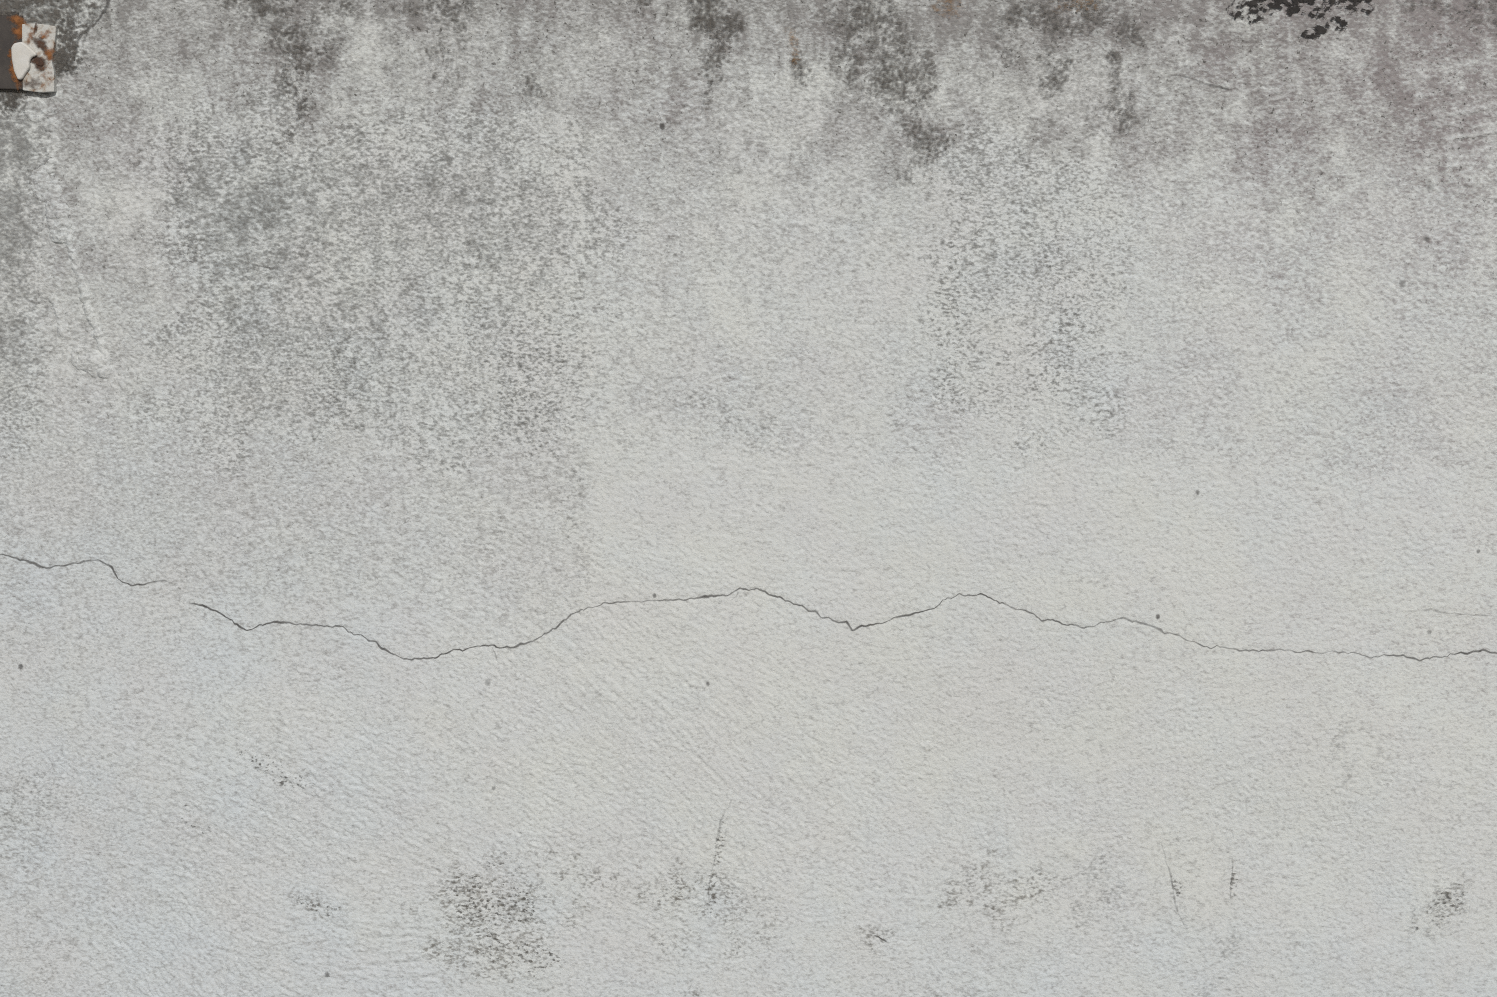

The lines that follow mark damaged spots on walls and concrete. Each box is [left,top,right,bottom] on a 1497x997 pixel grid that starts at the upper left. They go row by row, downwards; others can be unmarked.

corrosion [8,16,54,87]
damp [0,0,102,76]
damp [224,0,353,141]
damp [688,0,744,94]
damp [821,0,954,179]
damp [996,0,1143,130]
mould [1226,0,1374,40]
damp [0,89,47,368]
damp [175,139,342,369]
damp [357,150,540,268]
crack [0,554,147,586]
crack [193,588,1110,660]